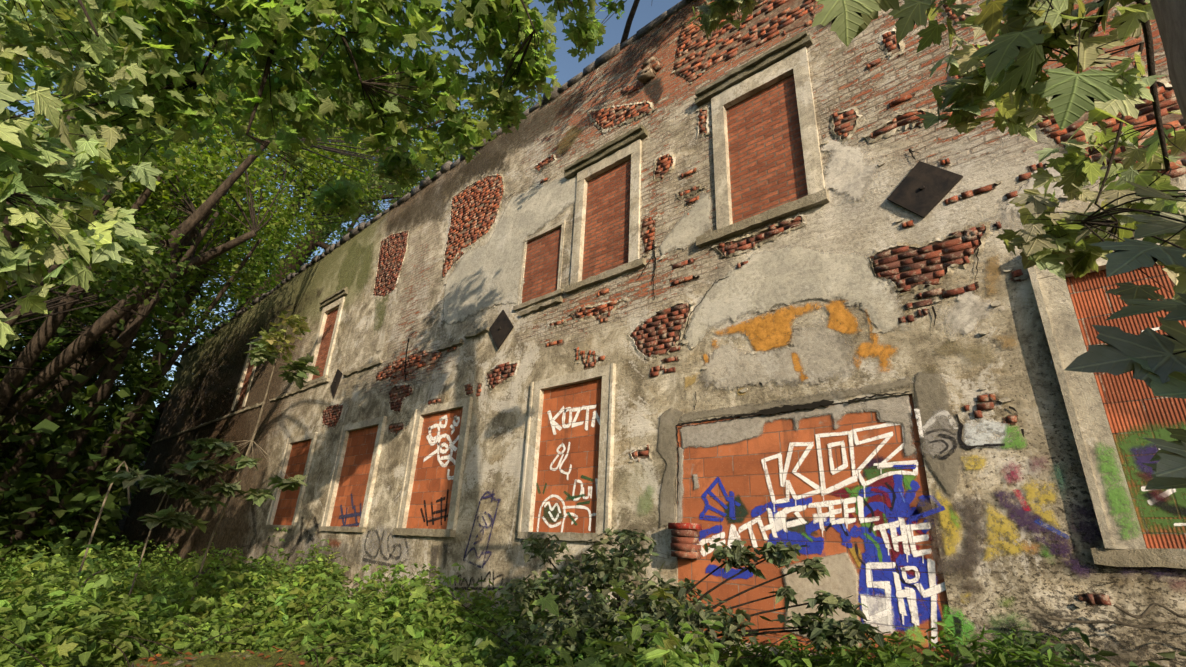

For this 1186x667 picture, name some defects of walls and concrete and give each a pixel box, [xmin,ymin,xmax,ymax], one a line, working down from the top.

flaking render [671,0,816,84]
peeling [821,93,952,201]
flaking render [372,229,410,299]
flaking render [441,173,513,280]
crack [637,240,656,299]
flaking render [641,214,700,286]
flaking render [711,212,807,268]
flaking render [868,73,1186,342]
flaking render [463,360,520,398]
flaking render [545,289,629,370]
flaking render [626,300,695,377]
flaking render [701,324,854,393]